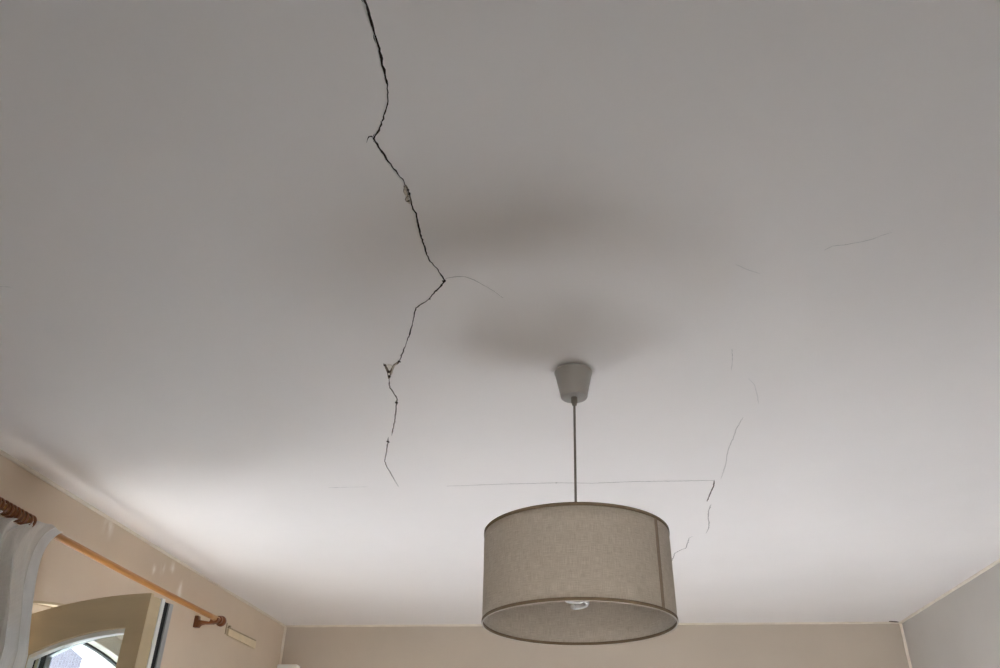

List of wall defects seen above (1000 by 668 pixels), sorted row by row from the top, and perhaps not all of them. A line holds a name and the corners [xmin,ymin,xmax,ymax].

crack [362,0,500,487]
crack [672,354,759,561]